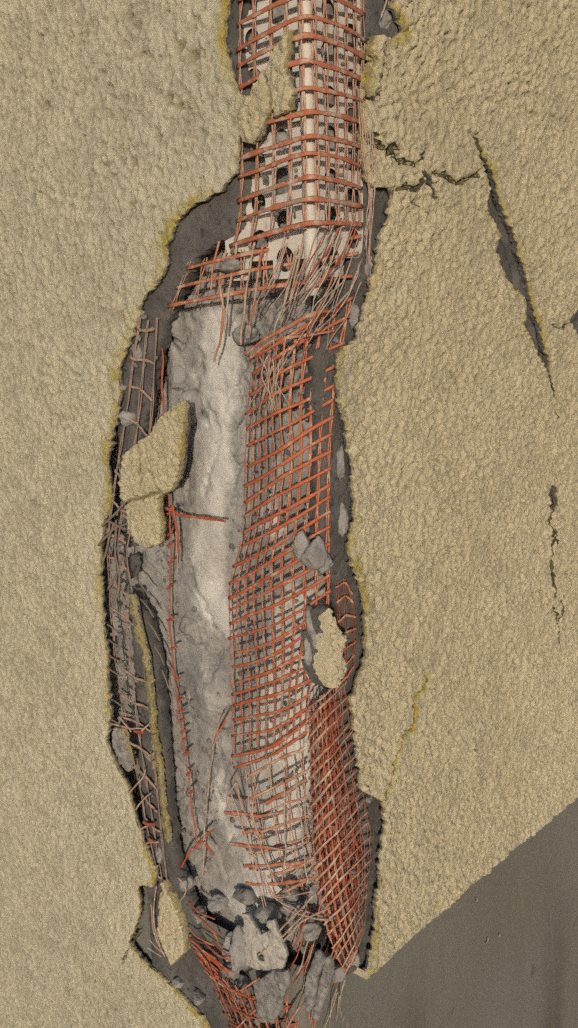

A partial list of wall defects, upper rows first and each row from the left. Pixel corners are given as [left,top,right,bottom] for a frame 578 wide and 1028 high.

crack [367,132,578,419]
spalling [98,0,405,1028]
crack [548,485,565,643]
crack [386,678,428,796]